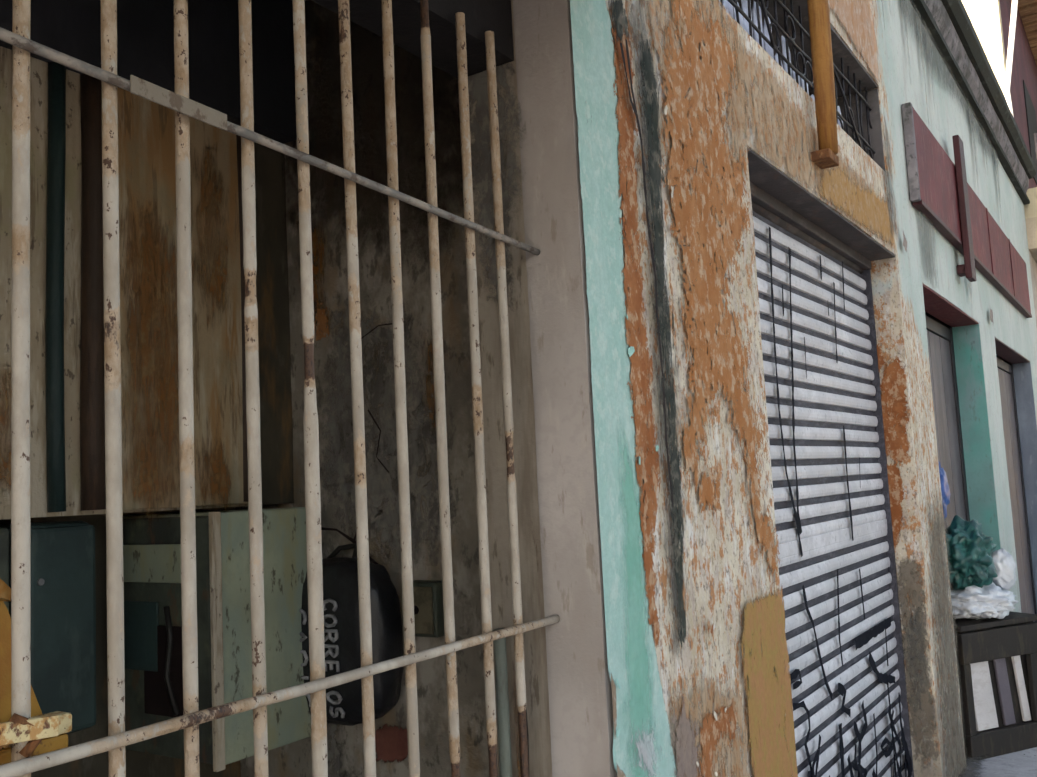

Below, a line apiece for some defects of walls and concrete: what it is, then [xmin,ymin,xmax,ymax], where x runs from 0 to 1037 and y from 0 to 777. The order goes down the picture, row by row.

peeling [611,27,663,647]
peeling [646,0,887,586]
peeling [877,342,909,555]
peeling [611,674,657,776]
peeling [670,672,751,777]
water stain [896,491,968,777]